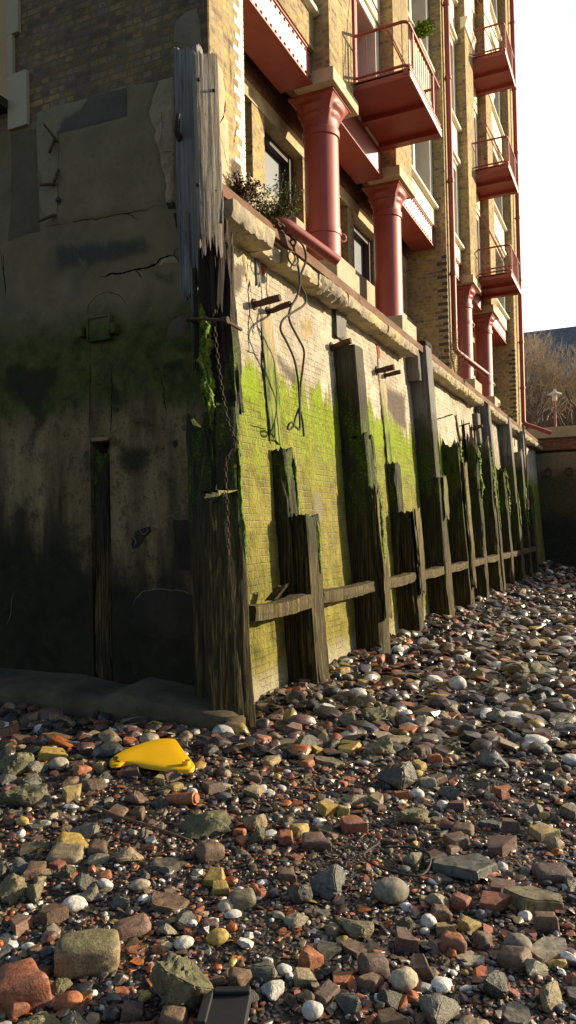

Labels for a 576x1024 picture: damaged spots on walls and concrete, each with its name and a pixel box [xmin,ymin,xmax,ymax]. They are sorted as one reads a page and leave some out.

crack [87,249,179,313]